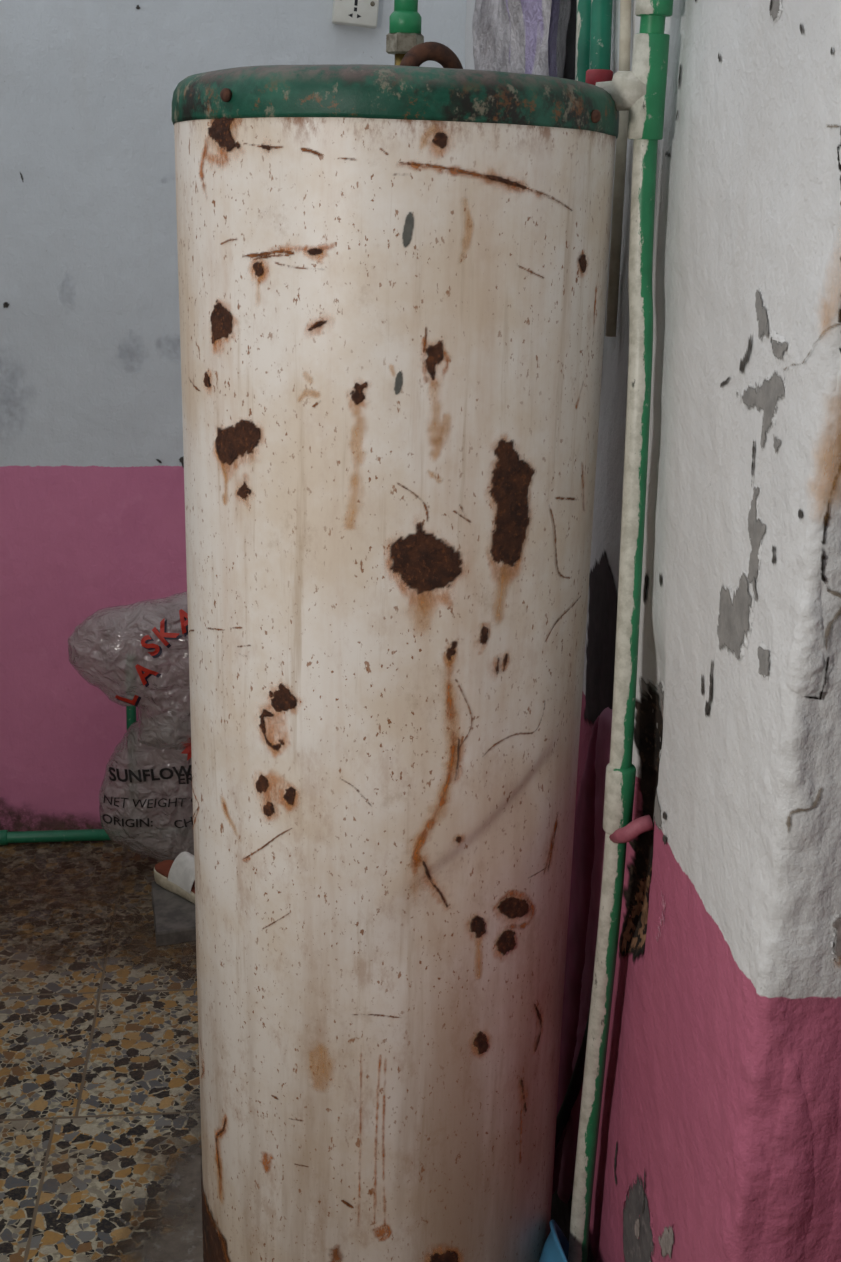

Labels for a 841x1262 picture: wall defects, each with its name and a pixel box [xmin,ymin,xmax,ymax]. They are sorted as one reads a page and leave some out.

peeling [769,0,783,25]
crack [827,125,841,184]
crack [784,309,841,370]
peeling [701,288,791,716]
peeling [643,574,662,604]
crack [806,435,841,700]
crack [786,788,822,832]
peeling [614,1142,675,1262]